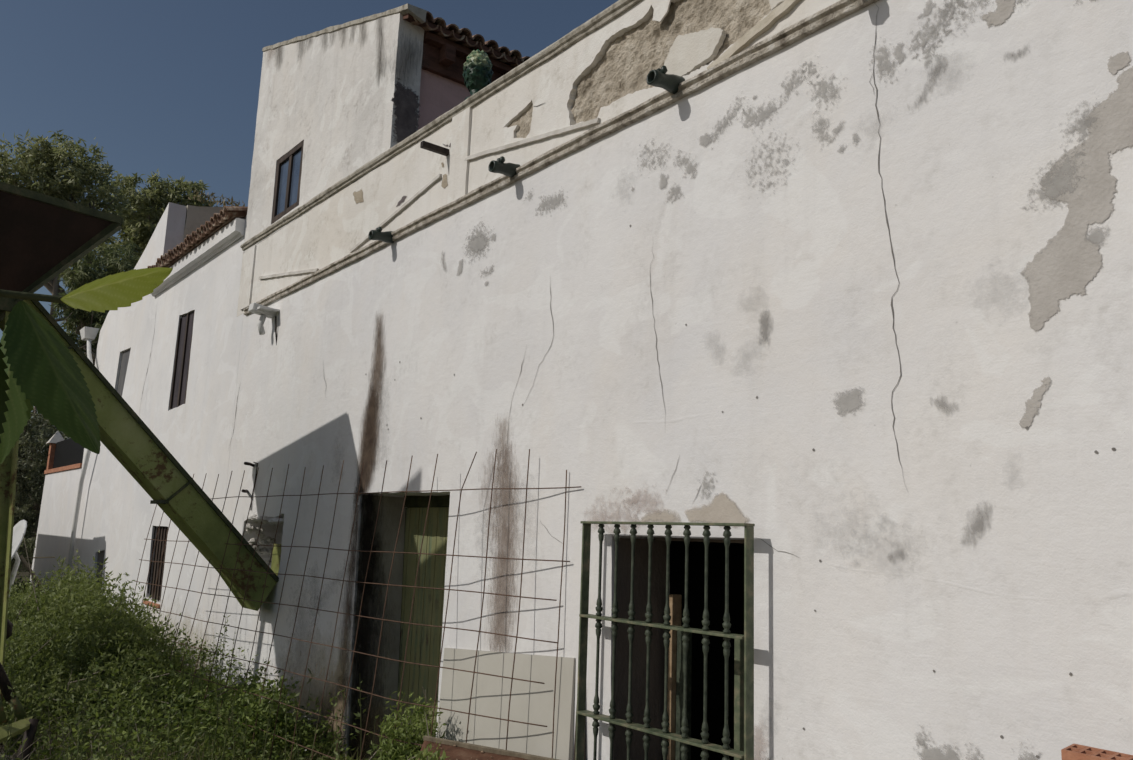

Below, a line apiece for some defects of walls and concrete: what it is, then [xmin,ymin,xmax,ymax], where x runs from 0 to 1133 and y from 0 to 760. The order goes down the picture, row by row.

spalling [571,0,785,123]
crack [869,6,907,489]
peeling [1020,52,1133,332]
crack [506,289,554,446]
peeling [1019,377,1051,430]
water stain [288,316,387,760]
peeling [592,471,748,530]